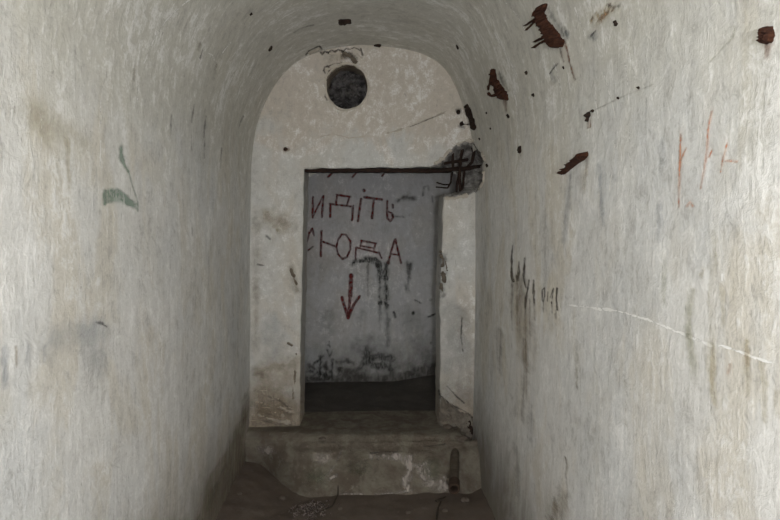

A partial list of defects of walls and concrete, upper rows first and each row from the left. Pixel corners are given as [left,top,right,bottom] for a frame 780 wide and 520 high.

rust [523,3,573,74]
rust [756,26,775,44]
rust [487,69,509,104]
rust [464,104,477,130]
spalling [425,138,488,200]
rust [557,151,589,175]
leakage [352,257,395,316]
crack [569,304,772,363]
leakage [305,348,436,383]